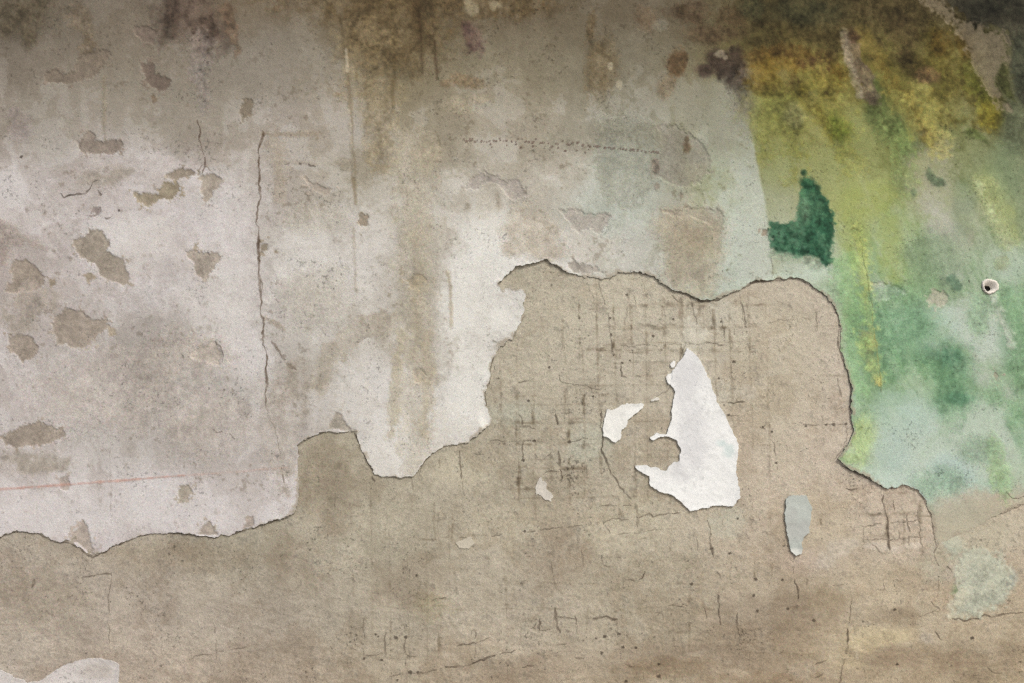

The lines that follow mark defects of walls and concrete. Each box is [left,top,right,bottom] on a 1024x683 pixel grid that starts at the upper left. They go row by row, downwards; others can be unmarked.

peeling [140,55,172,104]
water stain [632,0,1024,206]
peeling [67,128,225,289]
water stain [797,168,828,227]
water stain [0,0,488,530]
crack [255,130,297,483]
water stain [765,249,825,272]
water stain [945,272,964,293]
water stain [933,345,965,369]
water stain [939,389,980,407]
peeling [0,254,1024,683]
crack [861,495,952,571]